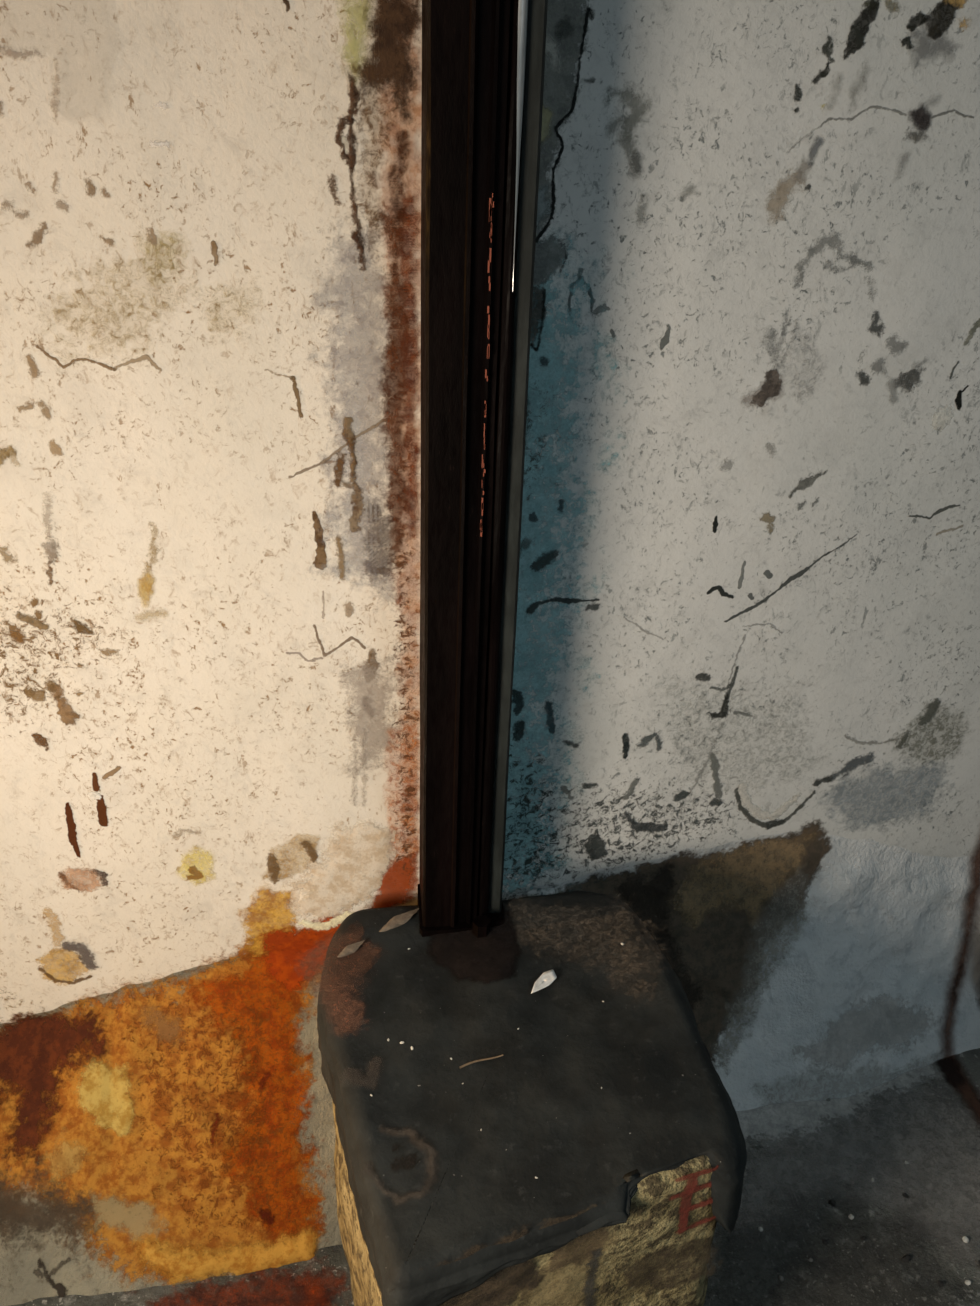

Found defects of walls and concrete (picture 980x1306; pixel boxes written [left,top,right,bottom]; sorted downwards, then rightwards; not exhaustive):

spalling [794,0,898,113]
spalling [901,0,967,58]
spalling [530,234,568,351]
damp [794,233,872,287]
spalling [743,369,782,407]
corrosion [353,0,421,908]
damp [502,258,832,1065]
crack [707,534,857,695]
spalling [239,835,352,957]
corrosion [0,917,345,1306]